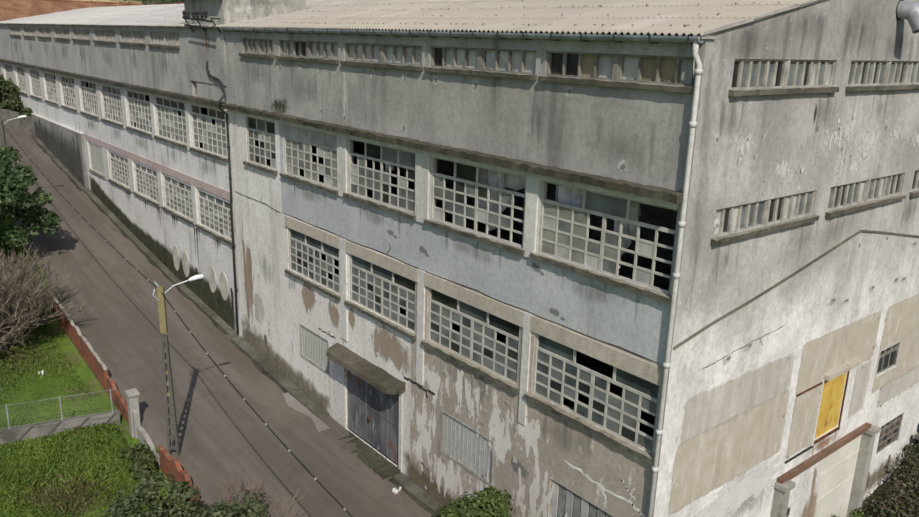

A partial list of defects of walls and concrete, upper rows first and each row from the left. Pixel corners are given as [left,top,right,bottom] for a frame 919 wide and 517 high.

peeling [301,283,316,315]
peeling [328,299,355,329]
peeling [369,326,412,375]
peeling [406,357,557,517]
crack [564,460,645,517]